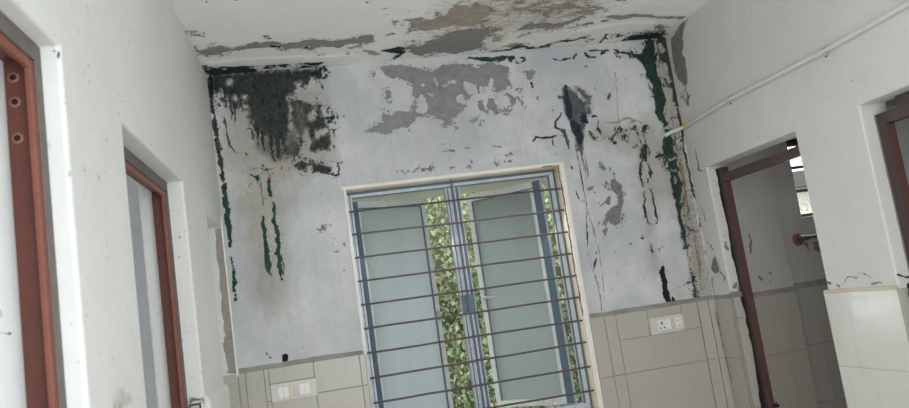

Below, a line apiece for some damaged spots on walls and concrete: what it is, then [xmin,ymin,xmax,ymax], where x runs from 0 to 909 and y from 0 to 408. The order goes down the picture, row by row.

leakage [202,55,345,374]
peeling [185,0,691,152]
leakage [467,25,701,250]
peeling [587,161,626,240]
leakage [672,268,701,301]